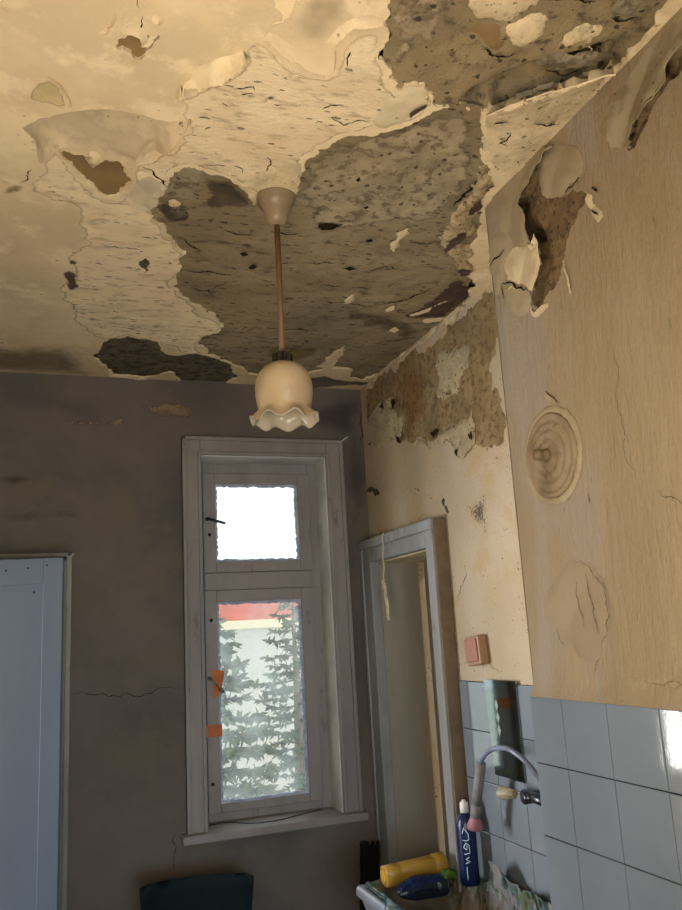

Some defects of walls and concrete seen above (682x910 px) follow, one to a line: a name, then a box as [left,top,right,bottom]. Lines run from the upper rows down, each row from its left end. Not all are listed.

flaking render [31,0,682,460]
damp [0,353,73,370]
crack [575,561,609,674]